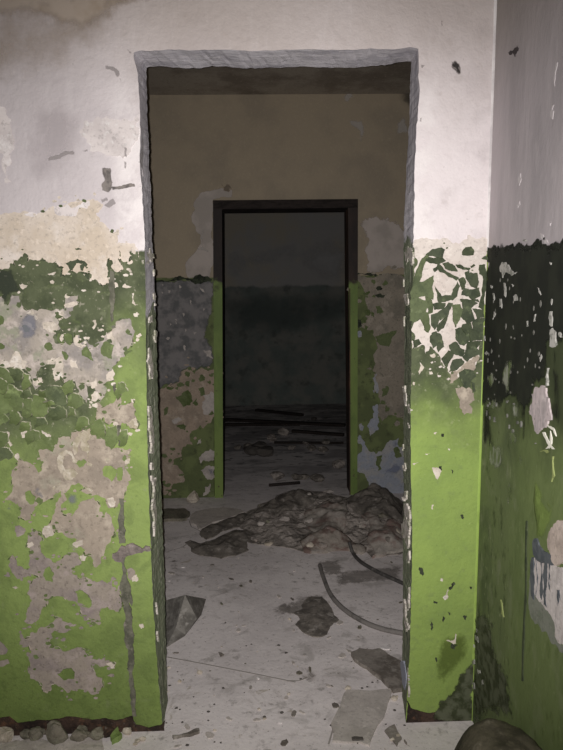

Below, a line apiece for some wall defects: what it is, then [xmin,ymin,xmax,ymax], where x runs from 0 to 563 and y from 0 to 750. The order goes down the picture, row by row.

peeling [549,299,563,348]
peeling [0,192,214,701]
peeling [357,235,521,563]
peeling [510,349,553,434]
spalling [403,587,411,632]
peeling [528,520,563,653]